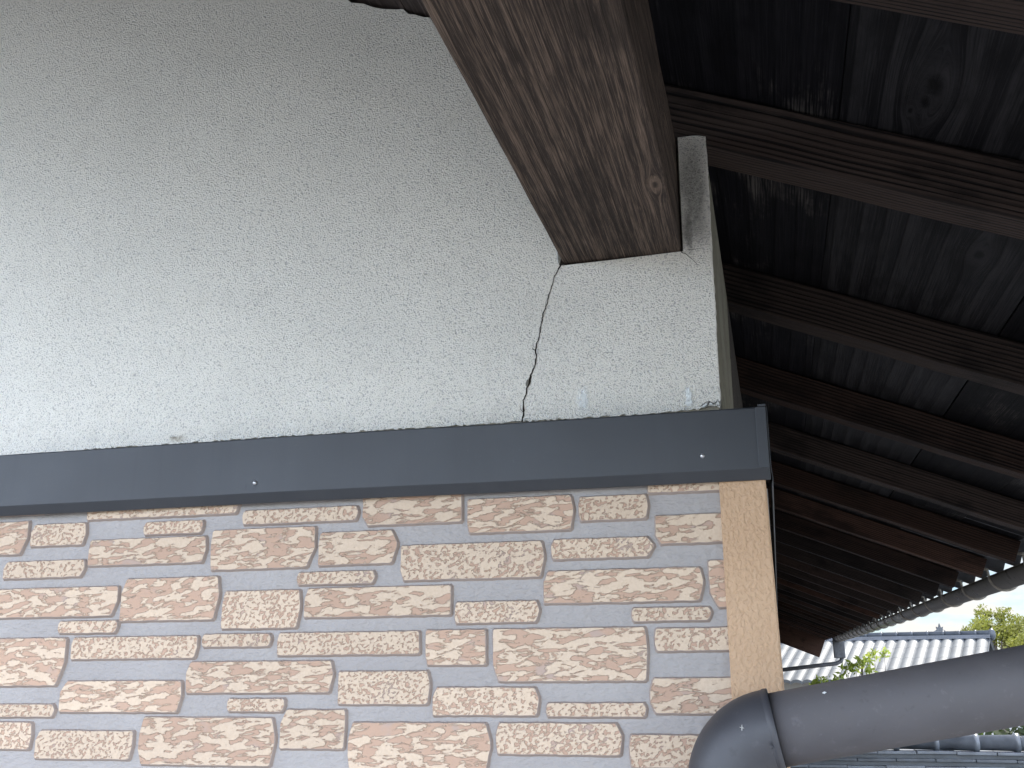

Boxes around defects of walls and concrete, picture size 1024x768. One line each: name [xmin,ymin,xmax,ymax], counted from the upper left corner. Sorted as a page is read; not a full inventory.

crack [520,262,561,422]